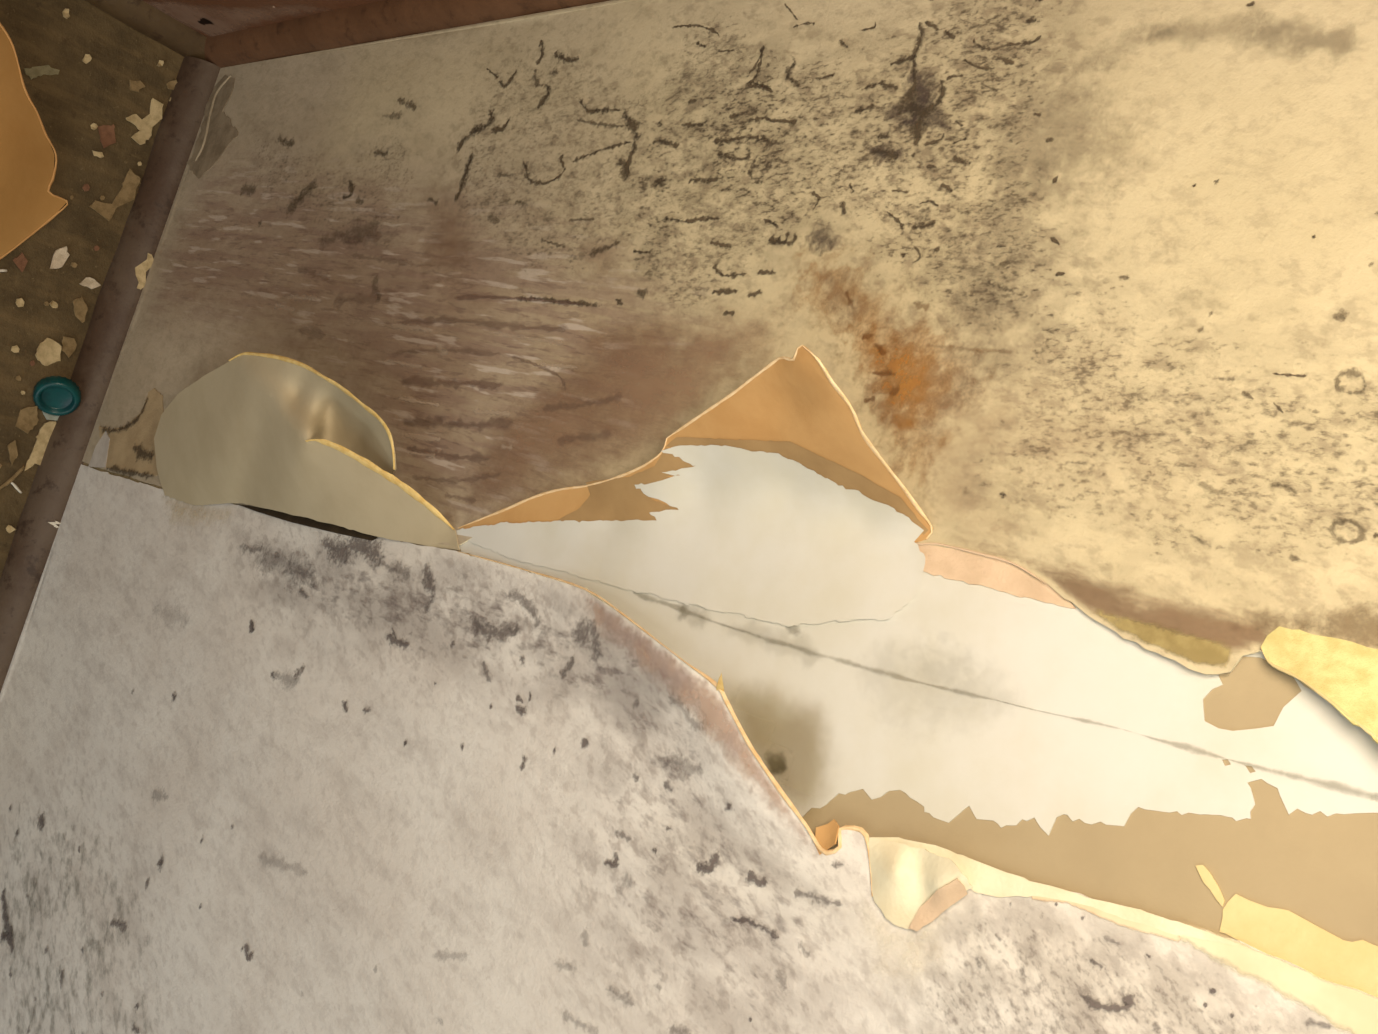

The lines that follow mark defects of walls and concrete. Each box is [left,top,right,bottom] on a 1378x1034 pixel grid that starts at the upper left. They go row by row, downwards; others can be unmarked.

water stain [534,40,579,108]
water stain [455,110,509,200]
water stain [523,100,678,185]
water stain [674,0,1059,324]
water stain [458,295,596,307]
corrosion [819,273,959,429]
water stain [354,567,435,648]
water stain [450,607,518,680]
water stain [769,757,786,773]
water stain [697,853,719,873]
water stain [747,871,767,887]
water stain [733,917,779,939]